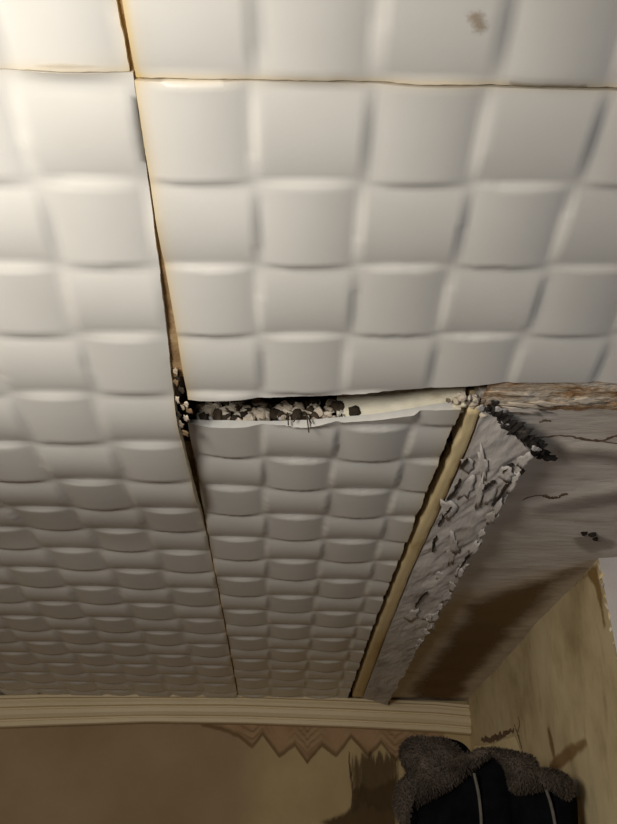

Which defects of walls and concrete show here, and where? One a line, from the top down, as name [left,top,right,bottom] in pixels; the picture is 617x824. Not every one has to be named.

flaking render [172,367,197,441]
spalling [249,395,337,417]
crack [539,419,617,444]
crack [523,492,568,500]
flaking render [404,379,617,651]